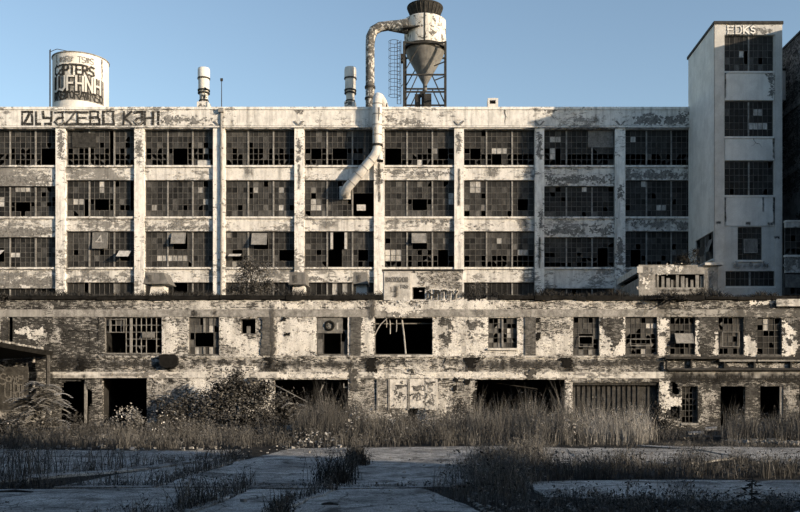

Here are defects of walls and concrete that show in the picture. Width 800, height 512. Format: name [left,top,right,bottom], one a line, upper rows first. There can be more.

peeling [160,115,213,126]
peeling [14,300,183,354]
peeling [124,269,800,415]